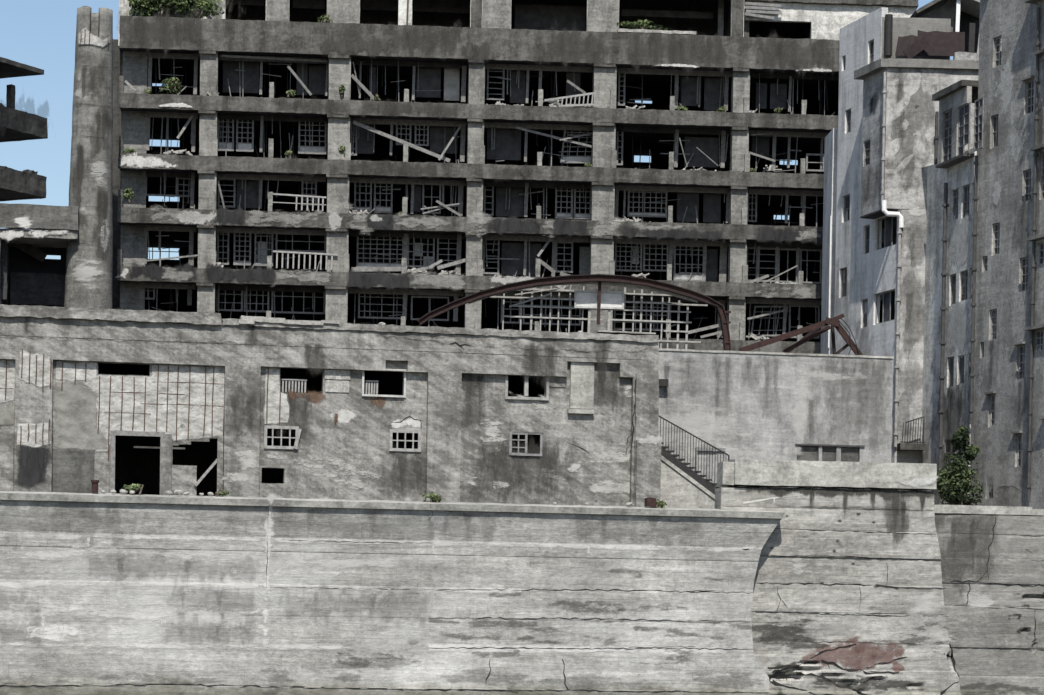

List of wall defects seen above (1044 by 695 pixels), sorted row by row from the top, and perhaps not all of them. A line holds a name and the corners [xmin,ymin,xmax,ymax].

spalling [0,349,225,459]
peeling [391,417,422,429]
crack [0,505,1044,695]
spalling [752,615,925,690]